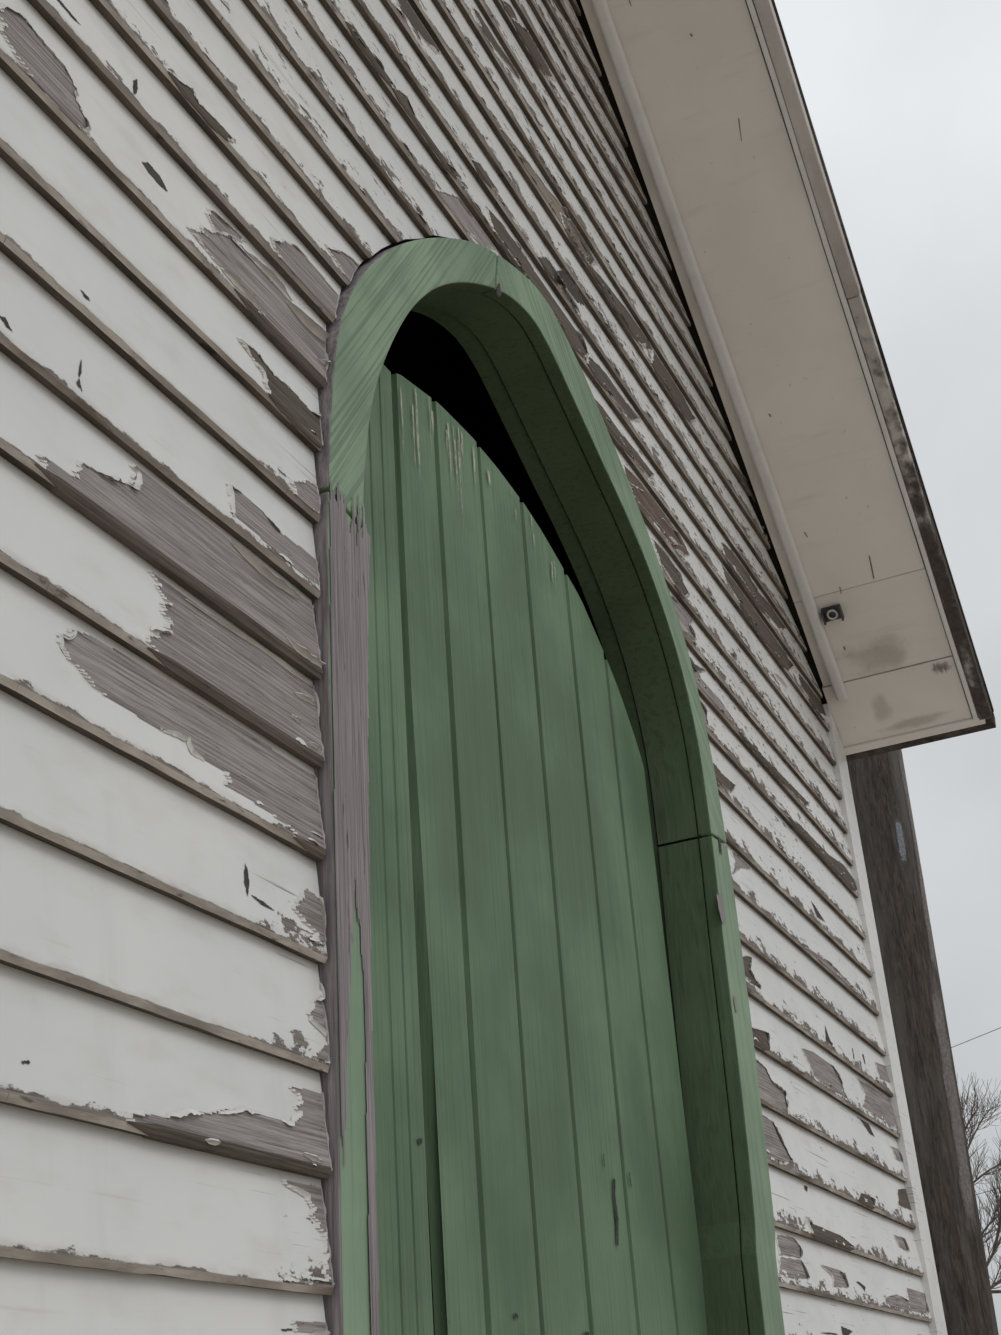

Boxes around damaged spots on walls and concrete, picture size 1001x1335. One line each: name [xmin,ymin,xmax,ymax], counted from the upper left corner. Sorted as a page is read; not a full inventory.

peeling [0,2,91,135]
peeling [185,207,329,389]
peeling [324,243,359,281]
peeling [236,337,324,448]
peeling [345,0,858,892]
peeling [34,453,380,1335]
peeling [743,955,761,993]
peeling [752,1027,830,1185]
peeling [785,1045,911,1216]
peeling [775,1216,868,1298]
peeling [873,1234,910,1264]
peeling [881,1287,930,1319]